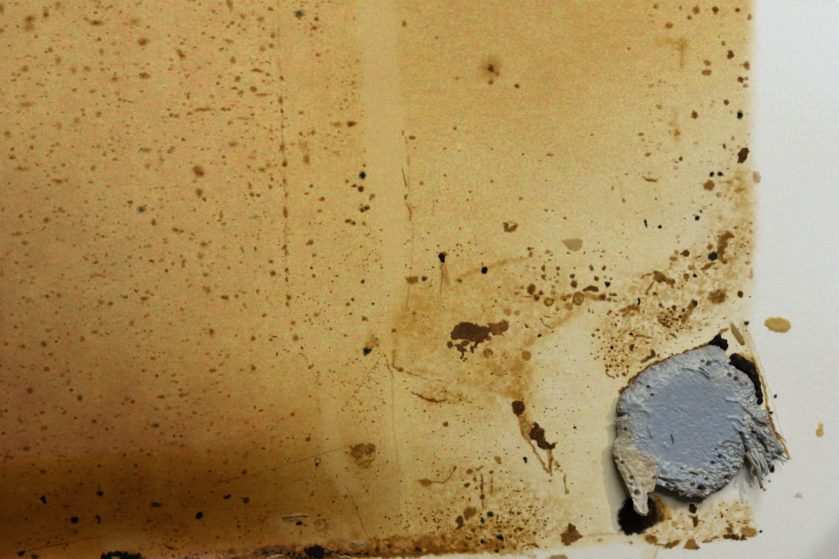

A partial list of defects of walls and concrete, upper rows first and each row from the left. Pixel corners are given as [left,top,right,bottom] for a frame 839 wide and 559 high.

rust [512,401,525,416]
peeling [745,398,772,442]
rust [530,422,560,467]
peeling [613,406,716,516]
damp [101,550,142,559]
damp [262,544,353,559]